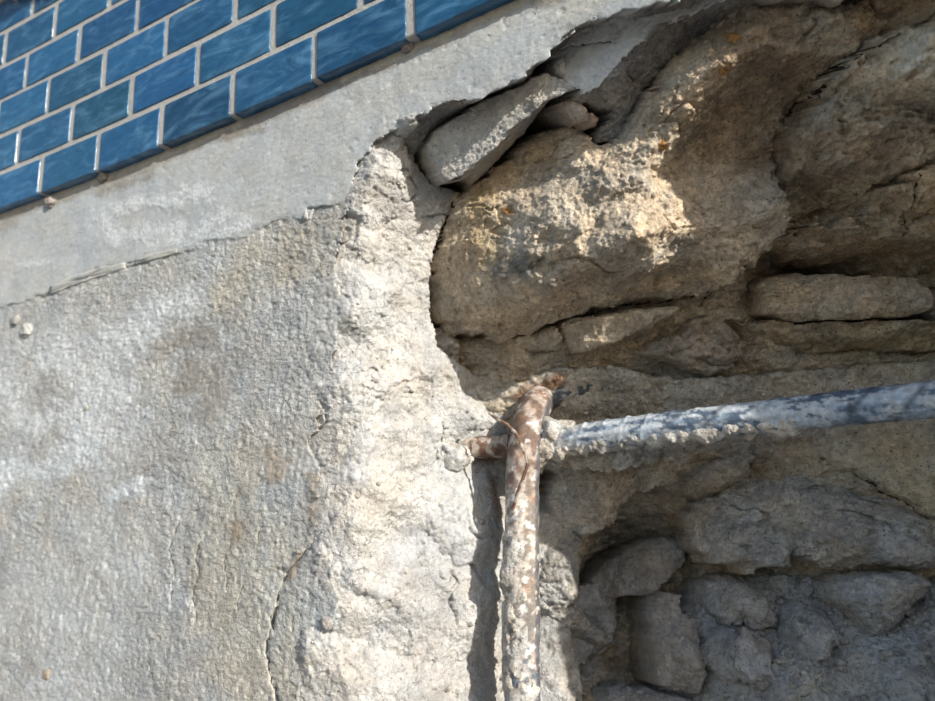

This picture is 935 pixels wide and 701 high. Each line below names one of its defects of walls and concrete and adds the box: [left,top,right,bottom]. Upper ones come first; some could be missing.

crack [782,32,901,123]
peeling [49,249,178,295]
spalling [287,0,935,701]
crack [854,474,928,519]